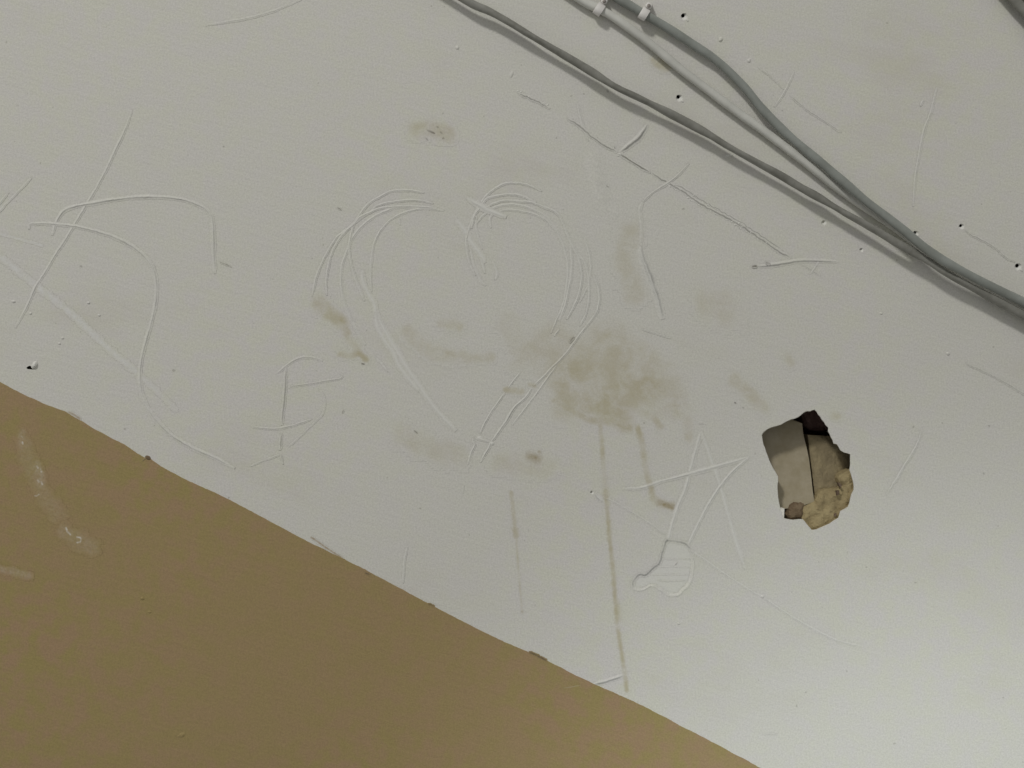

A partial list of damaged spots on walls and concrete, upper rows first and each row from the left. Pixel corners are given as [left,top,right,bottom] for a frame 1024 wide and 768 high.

damp [387,214,698,694]
spalling [762,410,854,530]